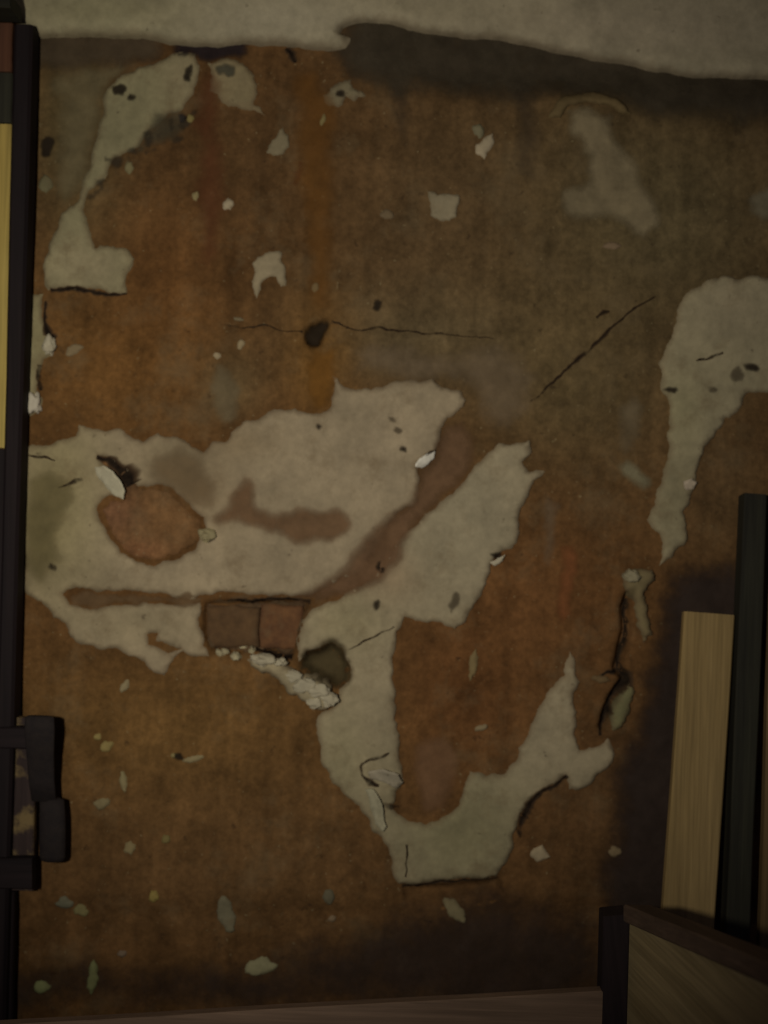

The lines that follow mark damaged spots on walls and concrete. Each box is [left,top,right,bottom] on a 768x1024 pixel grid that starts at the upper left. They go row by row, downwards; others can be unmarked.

crack [35,364,43,391]
crack [43,286,127,338]
peeling [28,52,265,417]
peeling [252,251,287,298]
crack [332,321,494,339]
peeling [428,191,460,221]
crack [531,296,655,401]
peeling [622,275,768,642]
peeling [24,376,635,885]
crack [598,598,633,736]